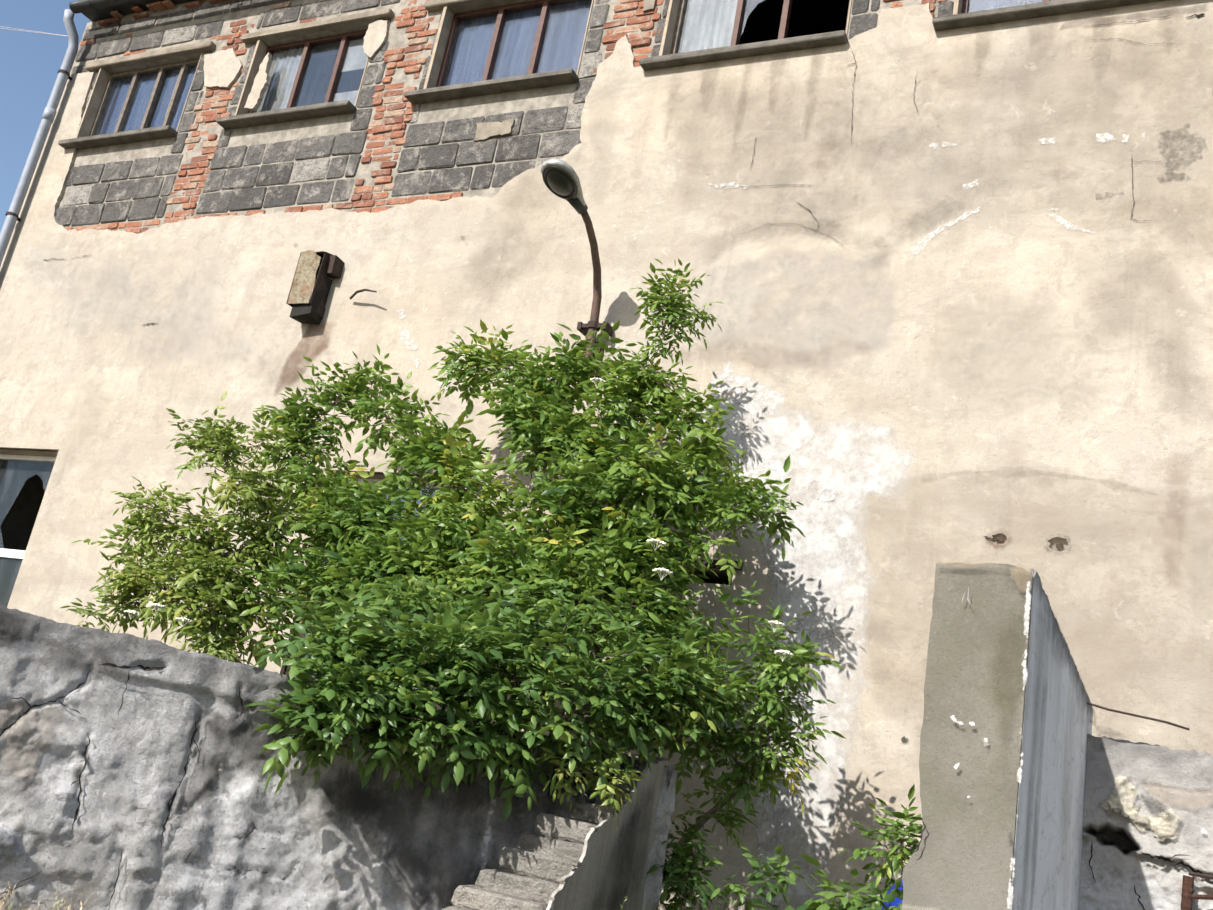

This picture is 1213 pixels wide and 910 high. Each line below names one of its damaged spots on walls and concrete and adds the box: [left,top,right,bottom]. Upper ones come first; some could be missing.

flaking render [849,0,903,39]
flaking render [921,0,954,18]
crack [1086,13,1205,45]
flaking render [56,0,670,234]
peeling [1096,133,1145,142]
peeling [912,207,980,255]
leakage [679,362,909,906]
crack [0,663,165,836]
crack [160,711,301,884]
spalling [1087,776,1182,854]